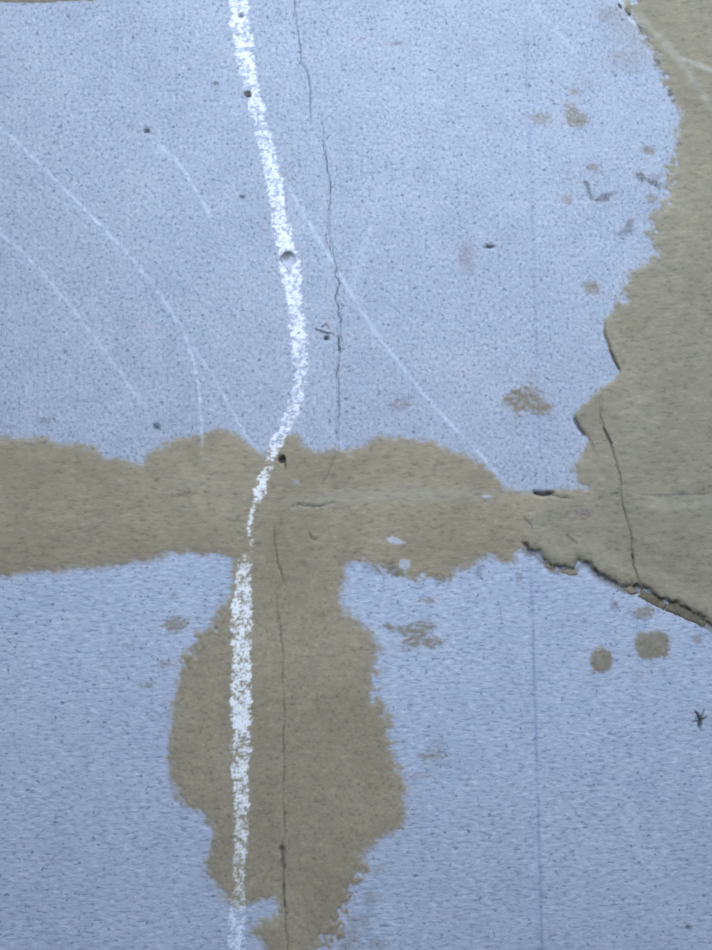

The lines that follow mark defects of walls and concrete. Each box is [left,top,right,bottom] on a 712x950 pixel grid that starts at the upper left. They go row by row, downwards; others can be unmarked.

peeling [522,0,712,627]